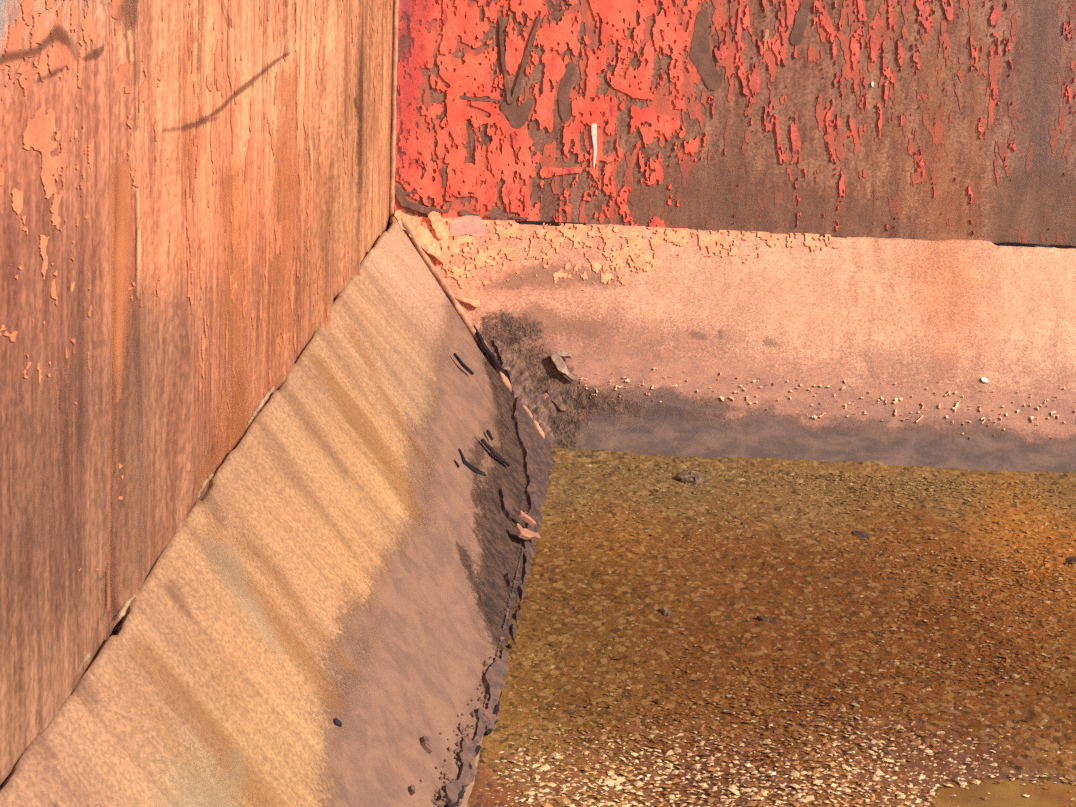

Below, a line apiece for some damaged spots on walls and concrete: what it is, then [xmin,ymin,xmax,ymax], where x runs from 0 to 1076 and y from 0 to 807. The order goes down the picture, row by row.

peeling [0,0,97,108]
peeling [970,0,1016,71]
peeling [0,108,95,306]
peeling [185,0,352,437]
peeling [341,0,953,308]
peeling [0,325,18,342]
peeling [23,354,51,385]
peeling [65,282,92,372]
leakage [484,308,1076,473]
leakage [319,298,499,807]